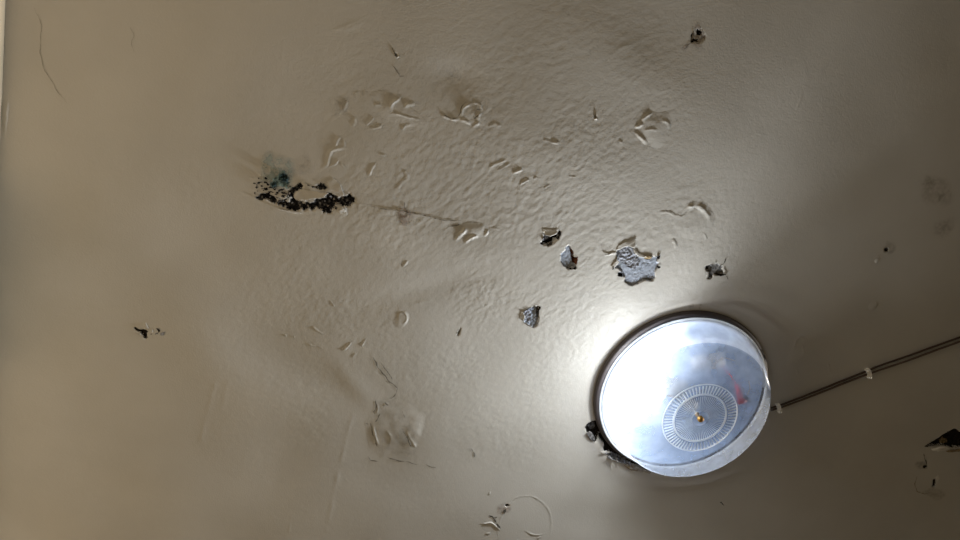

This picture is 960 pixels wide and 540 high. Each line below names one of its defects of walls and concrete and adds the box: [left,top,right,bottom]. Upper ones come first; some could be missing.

damp [253,156,355,214]
peeling [540,229,578,270]
peeling [604,240,661,286]
peeling [706,258,728,279]
spalling [134,323,165,339]
peeling [520,306,541,328]
spalling [585,420,655,474]
peeling [923,428,960,469]